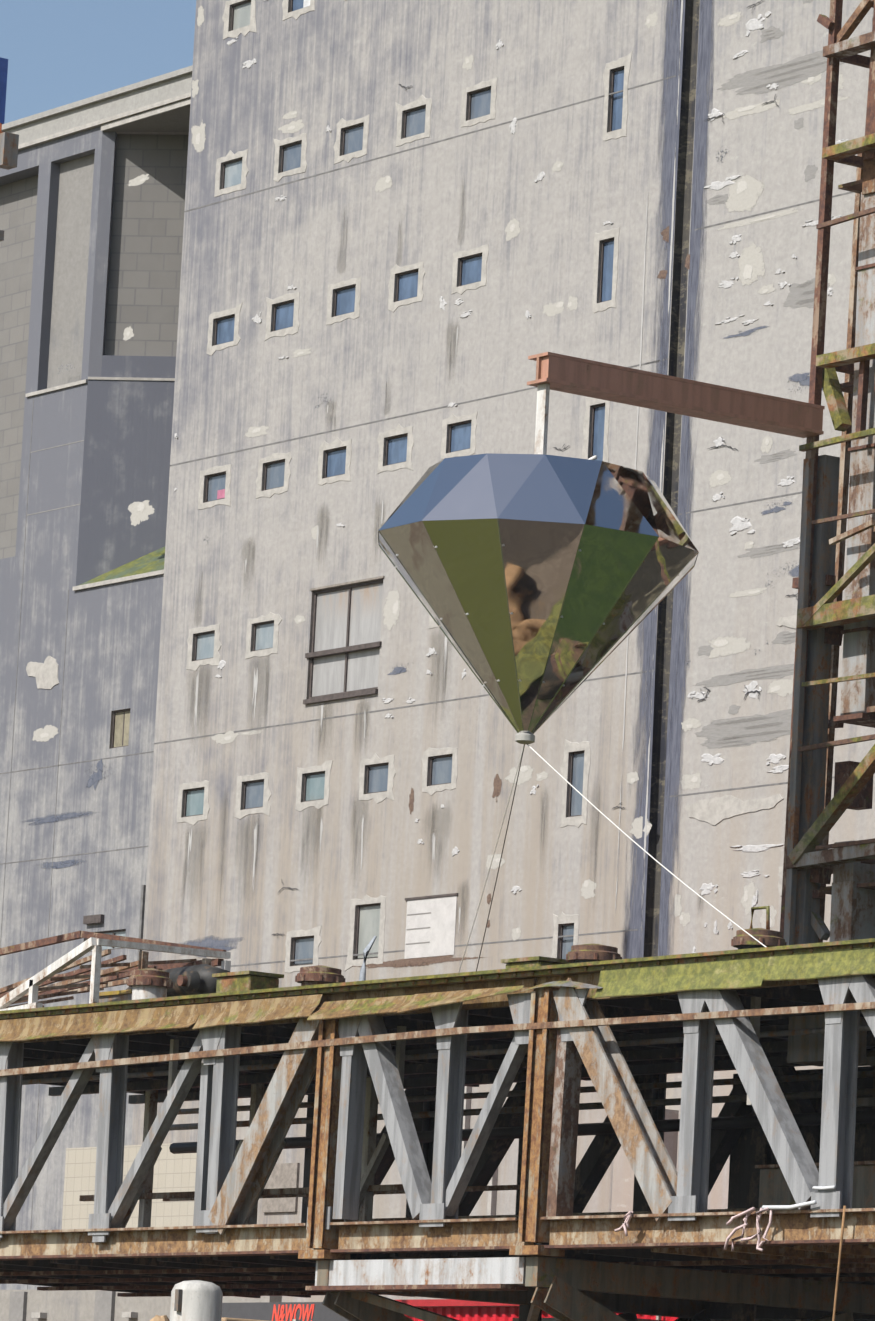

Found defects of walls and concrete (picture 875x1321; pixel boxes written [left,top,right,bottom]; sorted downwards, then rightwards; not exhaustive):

spalling [729,12,772,59]
spalling [708,105,756,122]
spalling [703,175,747,194]
peeling [718,215,778,289]
spalling [715,254,797,325]
spalling [729,516,755,545]
spalling [781,537,800,548]
spalling [743,680,781,699]
spalling [691,753,724,783]
spalling [766,754,789,774]
spalling [731,844,784,852]